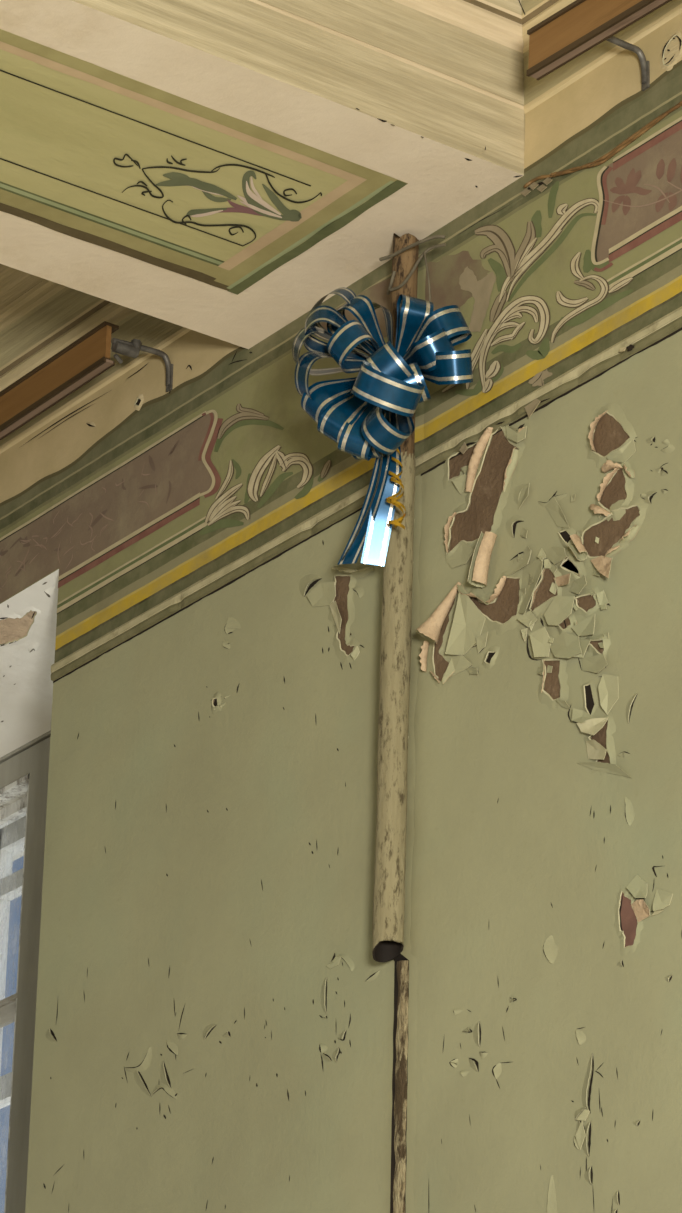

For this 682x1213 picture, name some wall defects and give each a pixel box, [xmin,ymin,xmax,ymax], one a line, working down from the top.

spalling [0,604,43,652]
peeling [299,565,374,670]
peeling [415,369,649,778]
peeling [614,855,673,956]